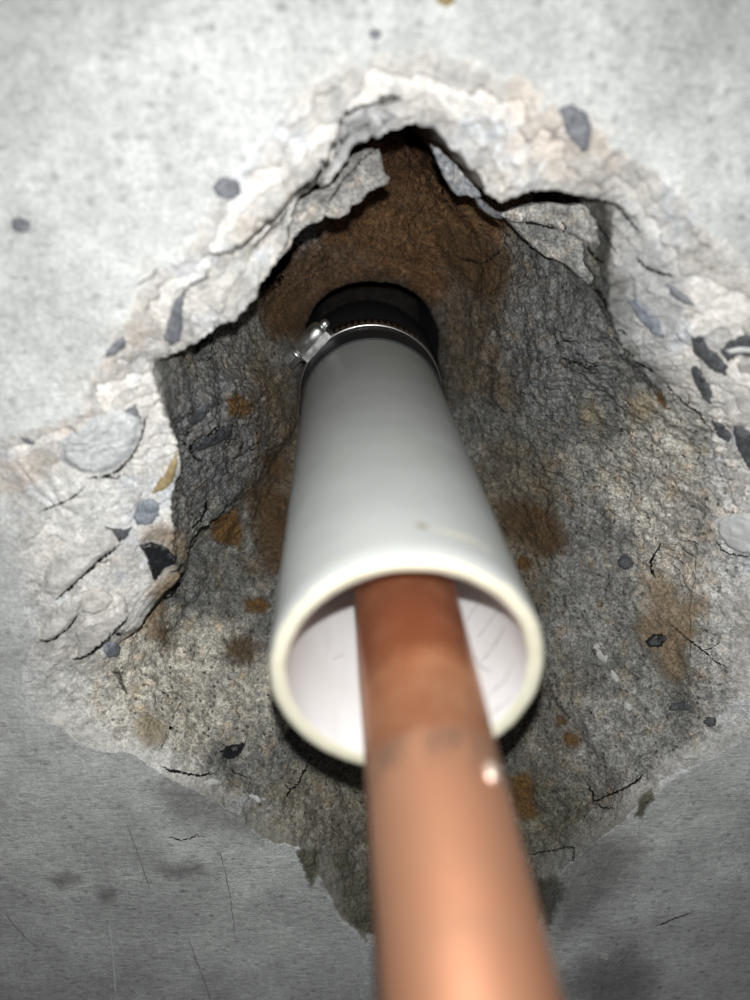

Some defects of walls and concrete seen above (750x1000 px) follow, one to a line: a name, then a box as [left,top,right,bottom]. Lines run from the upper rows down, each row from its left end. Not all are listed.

spalling [59,409,142,475]
spalling [110,122,707,856]
rust [211,506,243,546]
rust [499,502,567,556]
spalling [42,528,118,599]
crack [649,543,662,578]
spalling [74,596,129,658]
rust [640,577,703,677]
crack [669,621,728,668]
crack [161,766,214,777]
rust [509,774,538,820]
crack [587,773,644,809]